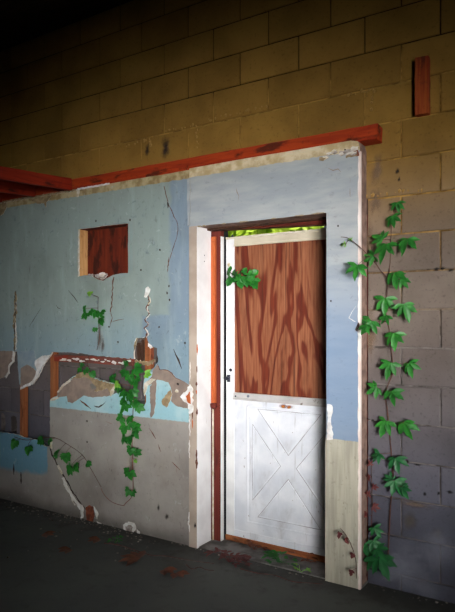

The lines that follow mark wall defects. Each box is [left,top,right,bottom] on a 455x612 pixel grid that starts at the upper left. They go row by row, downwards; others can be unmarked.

spalling [319,146,360,161]
crack [164,187,178,272]
crack [10,291,18,351]
peeling [173,349,198,469]
crack [50,441,85,518]
spalling [123,521,140,534]